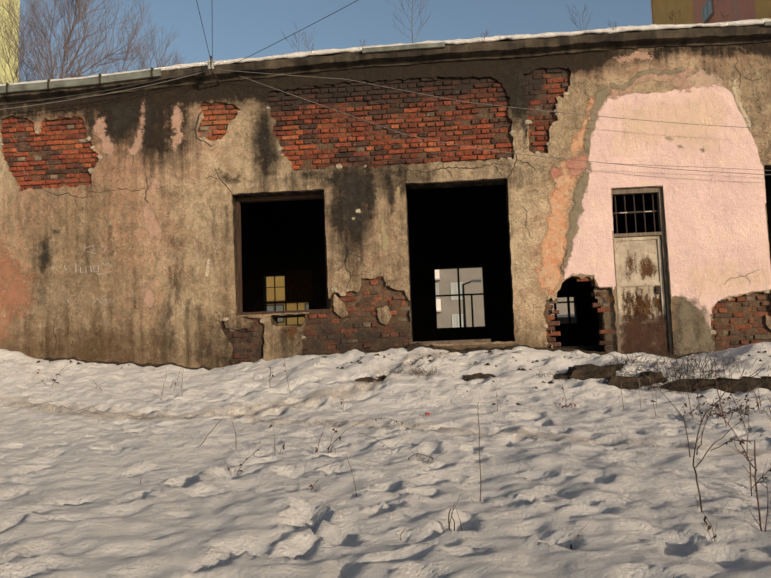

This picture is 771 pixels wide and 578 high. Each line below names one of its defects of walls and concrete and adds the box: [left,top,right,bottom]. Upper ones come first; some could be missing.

peeling [614,51,653,65]
spalling [0,116,115,191]
damp [104,95,157,147]
spalling [198,102,242,142]
spalling [266,77,514,171]
spalling [524,68,571,156]
peeling [535,67,771,352]
spalling [221,311,266,368]
spalling [284,277,423,355]
corrosion [619,250,670,355]